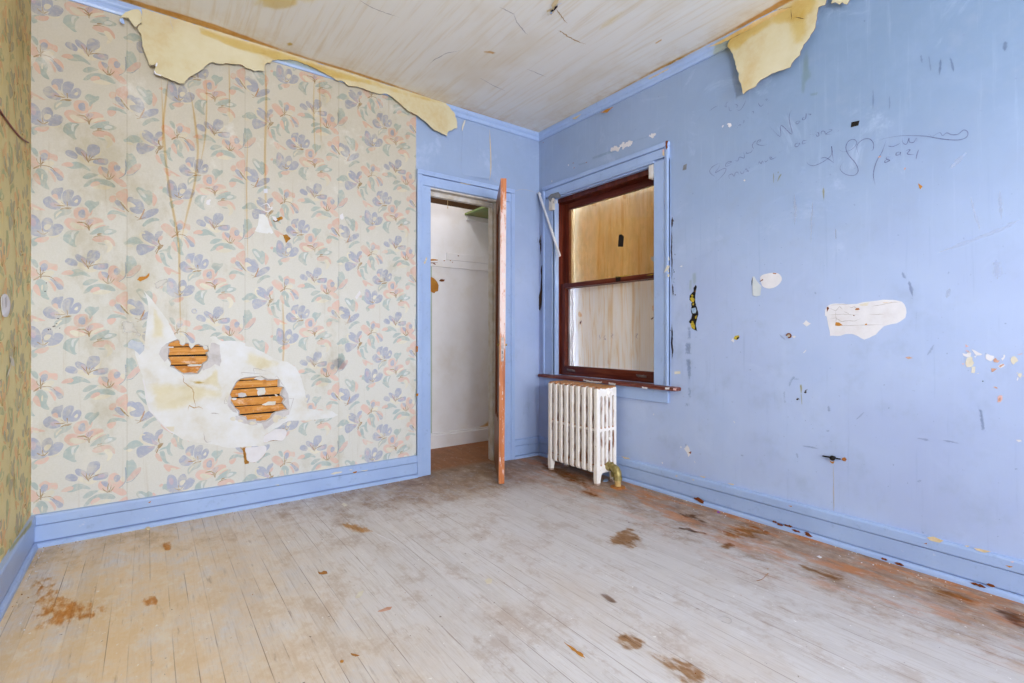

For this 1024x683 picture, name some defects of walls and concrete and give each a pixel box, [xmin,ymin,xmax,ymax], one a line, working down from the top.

peeling [752,273,782,296]
peeling [825,300,906,340]
flaking render [165,339,209,375]
peeling [962,344,1024,402]
flaking render [224,368,294,429]